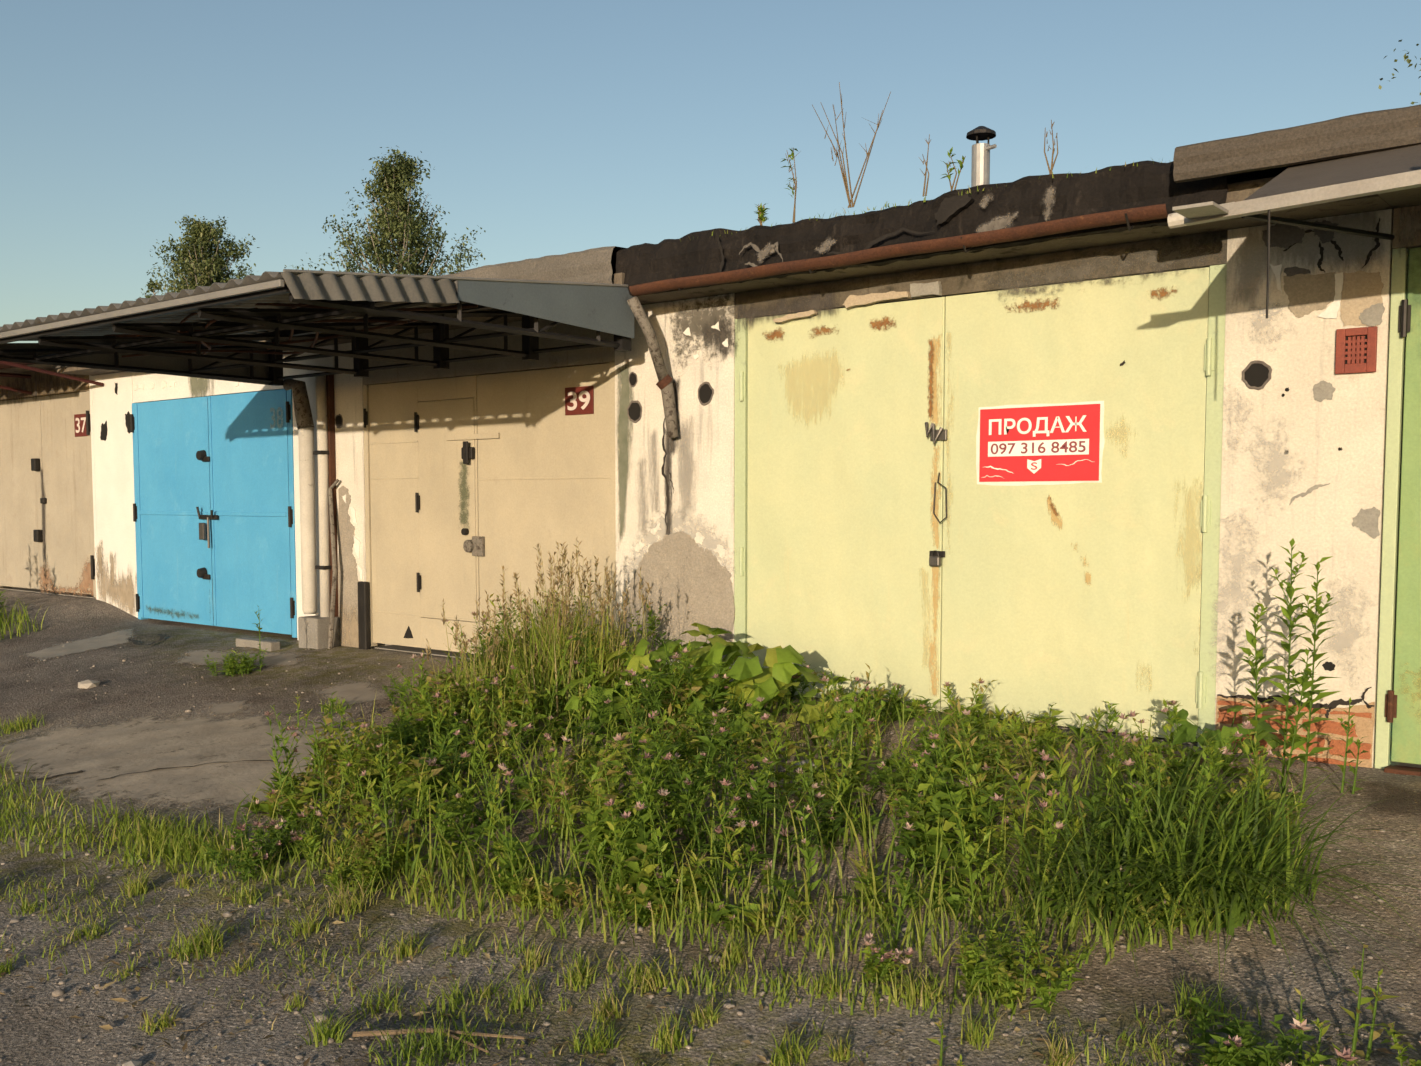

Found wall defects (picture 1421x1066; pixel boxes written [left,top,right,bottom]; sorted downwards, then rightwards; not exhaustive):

spalling [1244,214,1380,319]
peeling [670,293,737,366]
corrosion [870,316,896,331]
corrosion [1006,298,1059,313]
corrosion [927,337,940,425]
corrosion [931,446,941,548]
corrosion [1047,496,1062,529]
corrosion [929,566,940,695]
spalling [1215,696,1375,768]